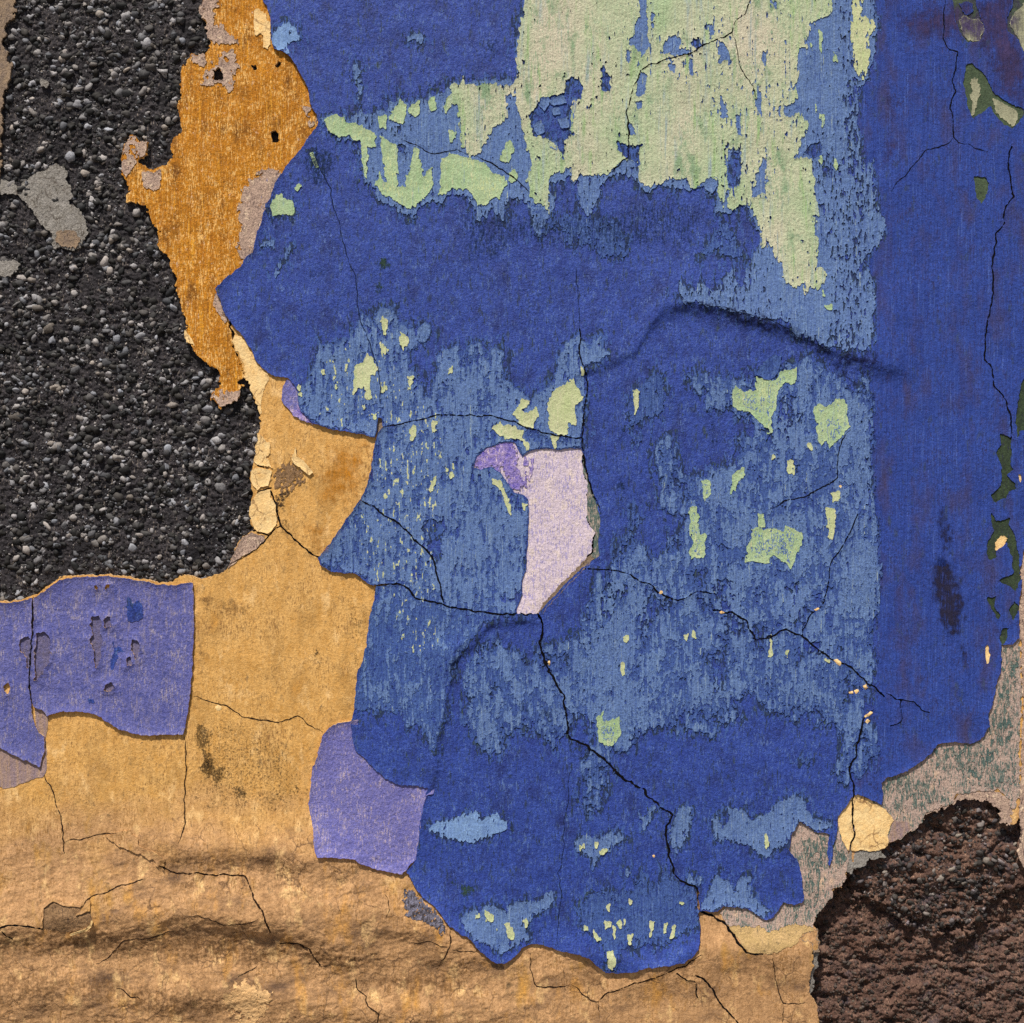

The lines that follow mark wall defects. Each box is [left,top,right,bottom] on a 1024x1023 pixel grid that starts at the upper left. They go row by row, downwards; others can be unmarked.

spalling [1007,0,1024,51]
spalling [963,63,1024,128]
crack [892,0,1015,438]
spalling [0,0,888,825]
spalling [991,379,1024,503]
spalling [986,513,1021,591]
crack [178,737,187,843]
crack [196,696,321,731]
crack [361,500,805,1023]
crack [587,514,926,849]
spalling [567,628,1024,1023]
crack [82,866,320,965]